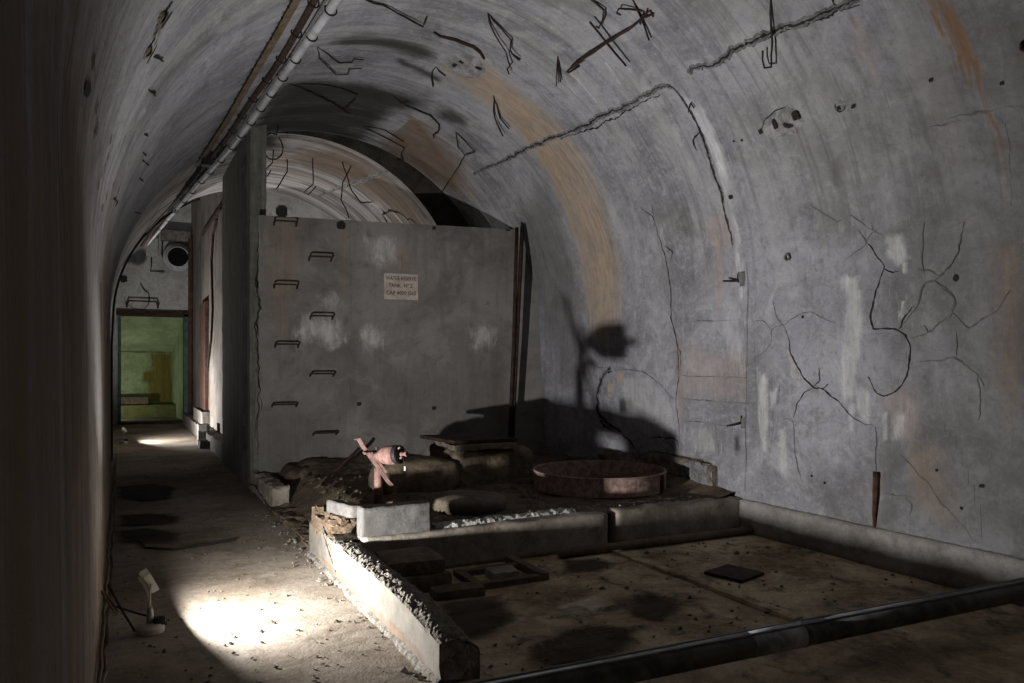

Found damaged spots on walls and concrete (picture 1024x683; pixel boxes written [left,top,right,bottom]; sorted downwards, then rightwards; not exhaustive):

spalling [758,107,805,139]
crack [254,232,262,455]
crack [473,0,877,475]
crack [809,205,1010,419]